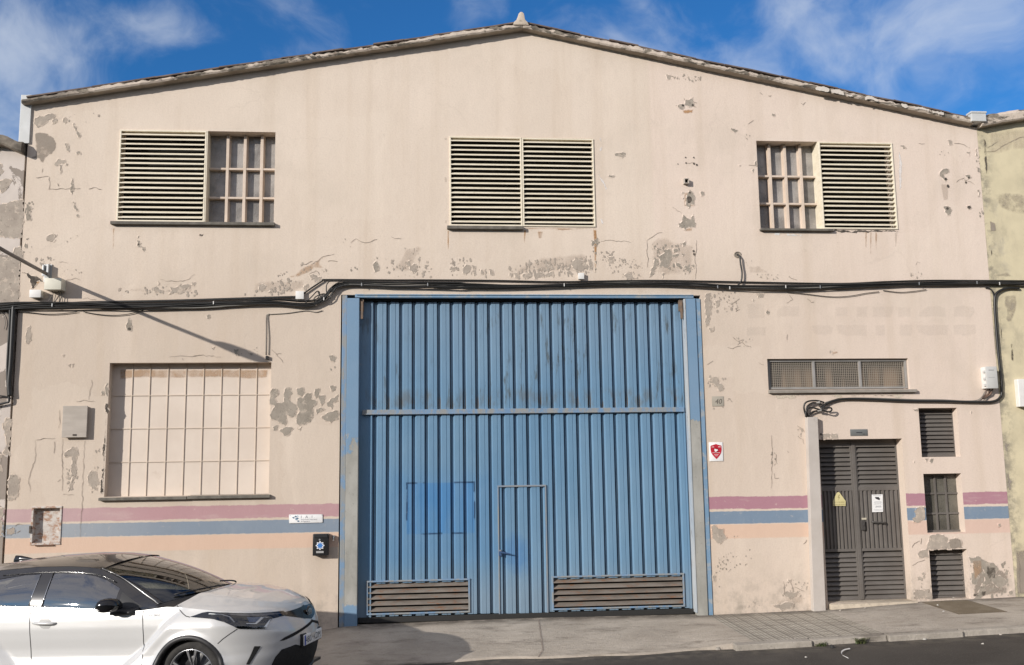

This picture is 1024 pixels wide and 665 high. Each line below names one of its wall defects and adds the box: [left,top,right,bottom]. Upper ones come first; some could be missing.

peeling [33,113,82,174]
peeling [0,163,43,302]
peeling [372,248,432,278]
peeling [450,257,495,278]
peeling [508,190,705,280]
peeling [269,385,339,437]
peeling [63,446,100,493]
peeling [912,533,1021,601]